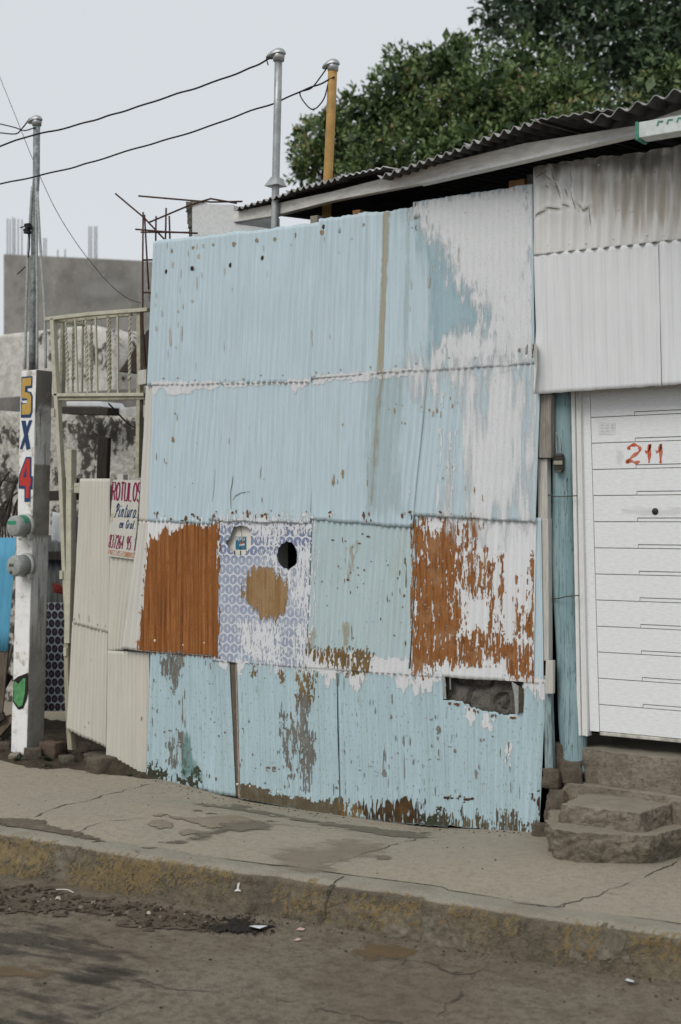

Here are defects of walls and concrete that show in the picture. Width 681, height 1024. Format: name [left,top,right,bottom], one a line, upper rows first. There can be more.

peeling [151,184,538,548]
peeling [141,651,205,769]
rust [137,509,280,660]
rust [241,565,288,622]
rust [278,622,374,705]
peeling [205,497,457,815]
rust [401,511,534,691]
rust [336,790,540,832]
crack [317,828,415,924]
crack [515,861,677,907]